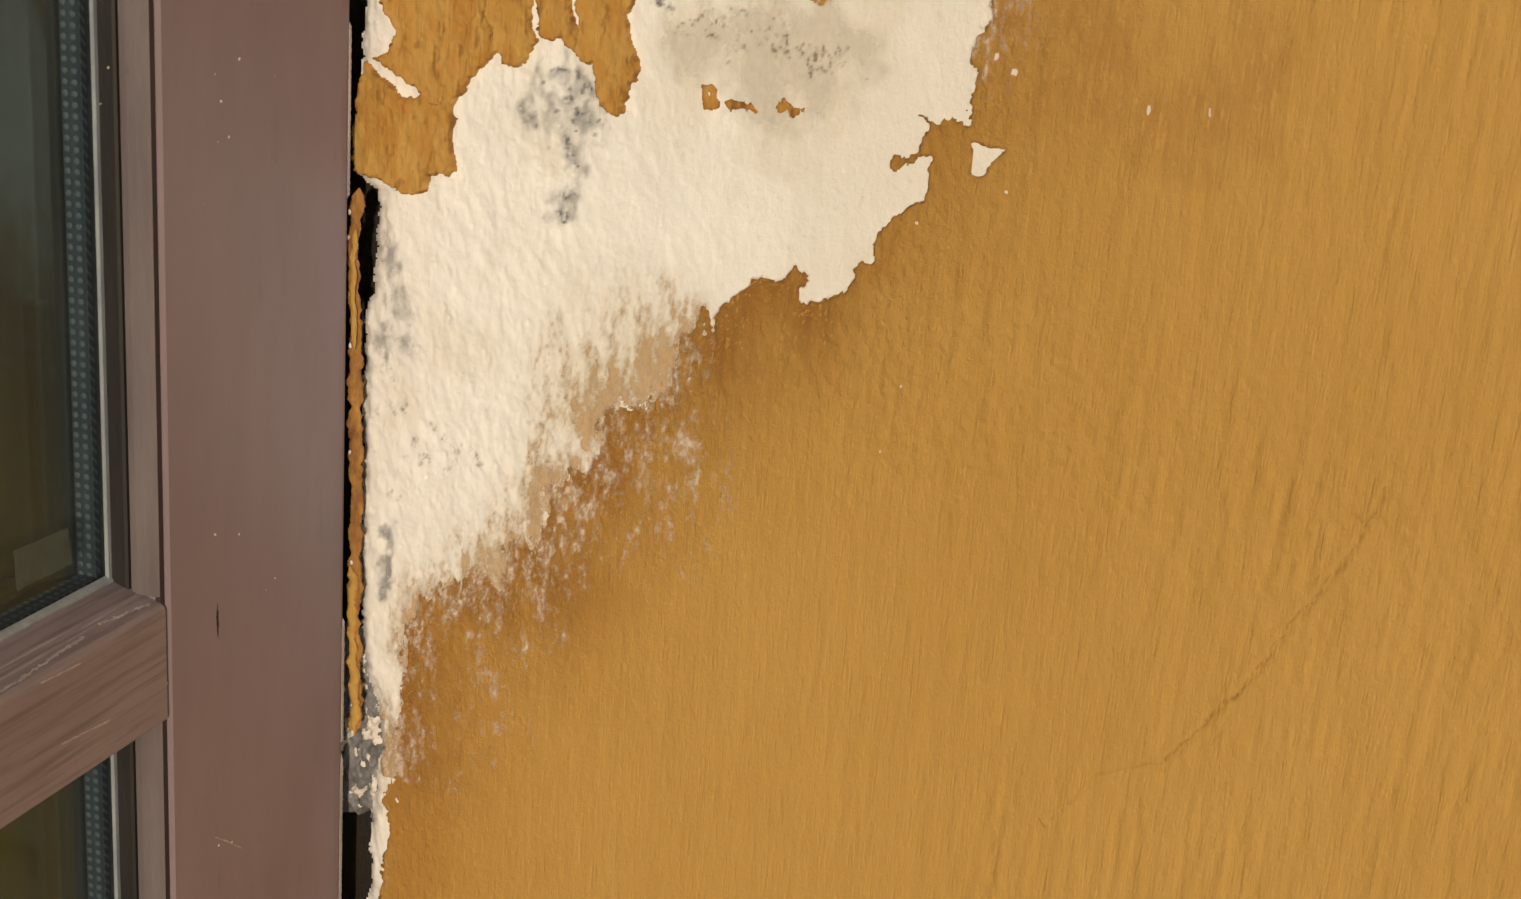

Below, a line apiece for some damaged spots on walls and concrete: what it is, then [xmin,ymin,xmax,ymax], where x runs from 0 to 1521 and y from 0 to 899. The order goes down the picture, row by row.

peeling [341,0,1031,899]